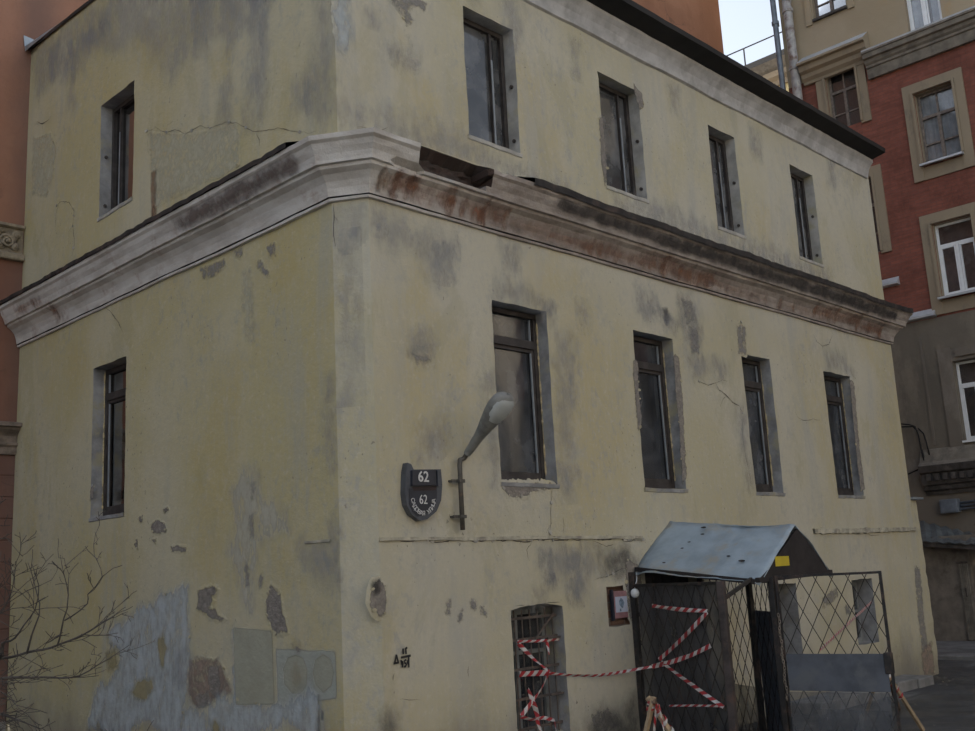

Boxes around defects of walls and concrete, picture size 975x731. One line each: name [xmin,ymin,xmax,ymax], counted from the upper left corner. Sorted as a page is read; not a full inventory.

peeling [388,0,427,27]
crack [145,120,315,139]
peeling [138,505,170,547]
flaking render [195,583,228,624]
flaking render [264,580,290,639]
flaking render [365,576,389,621]
peeling [185,654,233,709]